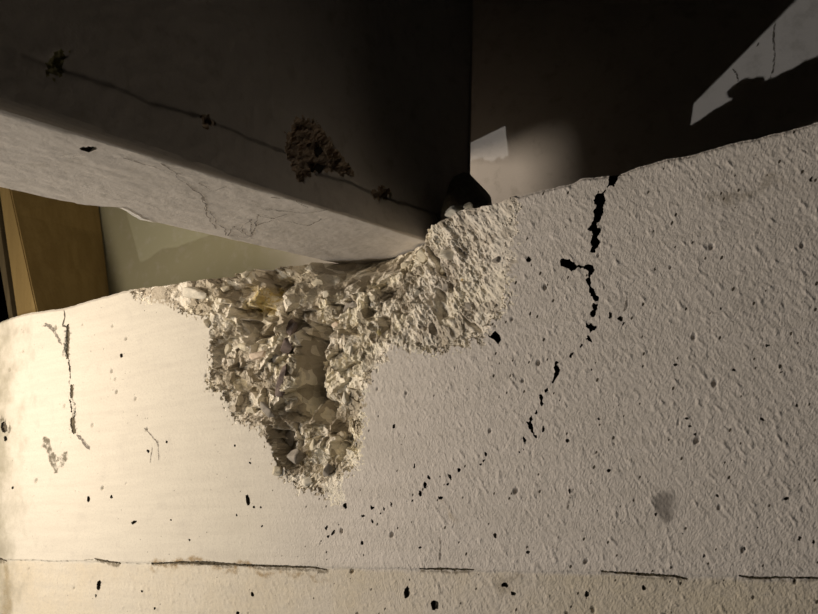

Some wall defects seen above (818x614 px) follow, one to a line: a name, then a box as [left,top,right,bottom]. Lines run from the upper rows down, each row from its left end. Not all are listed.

crack [124,158,325,239]
spalling [284,115,354,182]
crack [44,312,90,449]
spalling [130,196,525,510]
crack [518,175,620,453]
crack [370,452,487,523]